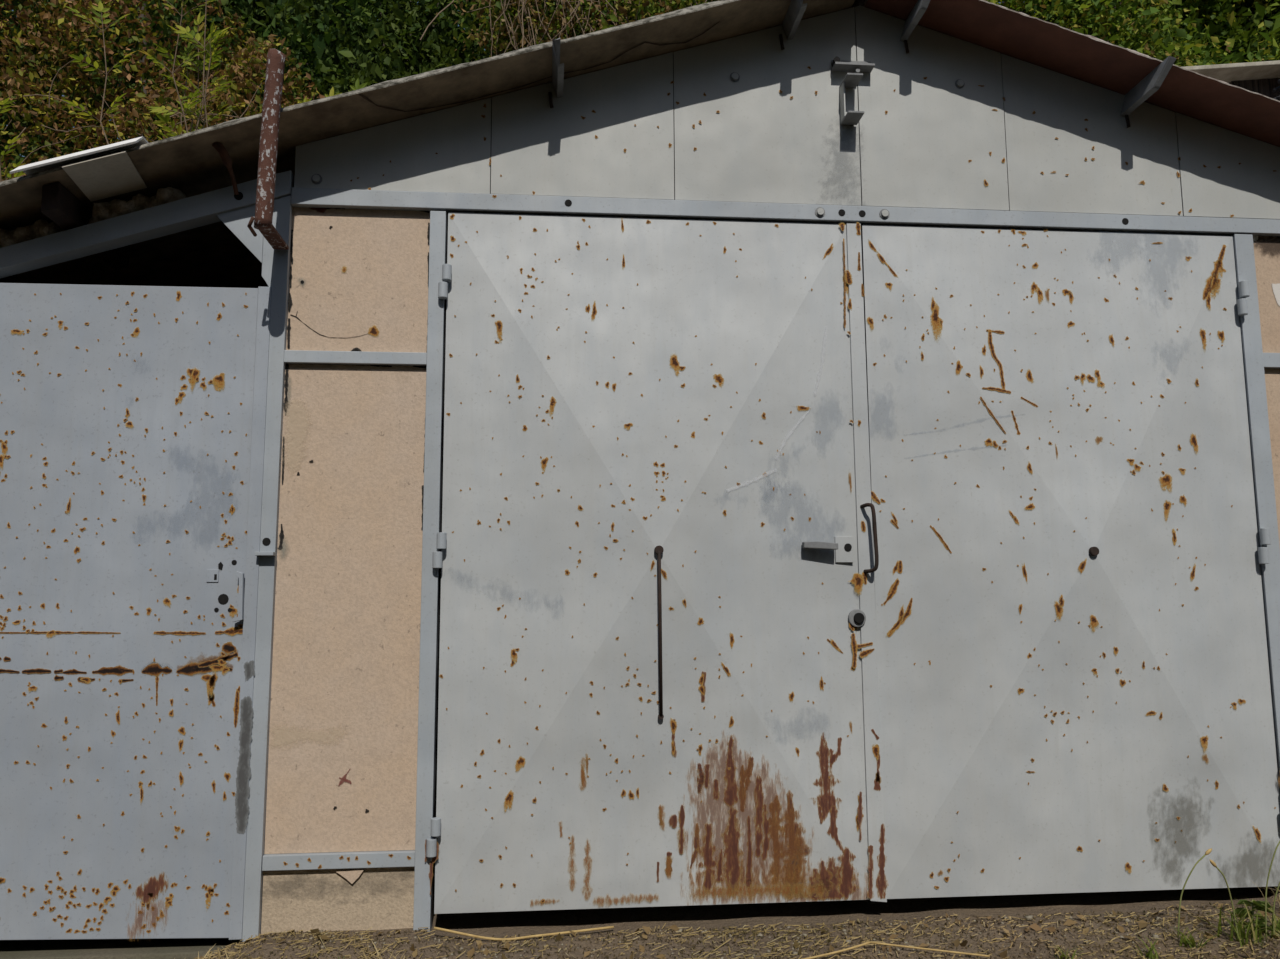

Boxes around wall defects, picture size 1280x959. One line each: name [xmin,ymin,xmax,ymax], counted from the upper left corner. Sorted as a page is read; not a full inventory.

rust [1206,260,1227,311]
rust [97,291,198,369]
rust [906,288,953,362]
rust [1200,330,1225,349]
rust [1067,369,1135,412]
rust [91,368,247,505]
rust [28,492,117,563]
rust [217,451,247,549]
rust [1127,433,1206,590]
rust [0,568,243,848]
rust [559,633,888,906]
rust [0,869,230,935]